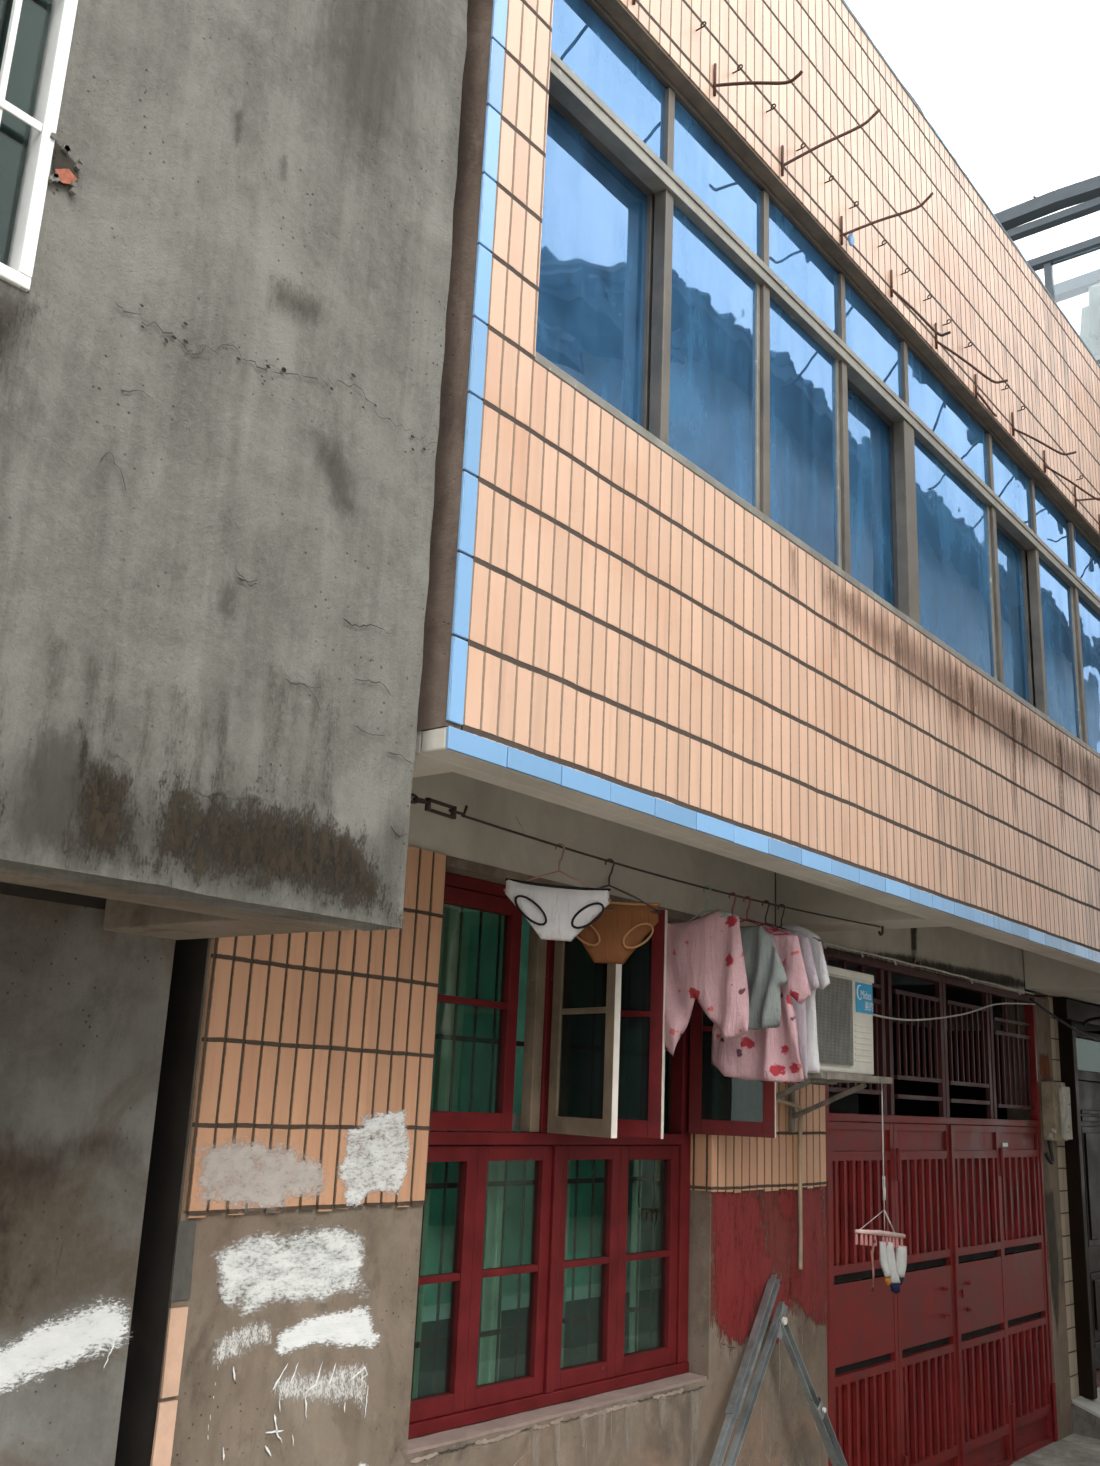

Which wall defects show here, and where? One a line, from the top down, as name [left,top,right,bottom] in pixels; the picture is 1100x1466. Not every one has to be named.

crack [114,301,434,453]
leakage [843,596,1098,820]
leakage [29,718,401,929]
peeling [710,1185,828,1355]